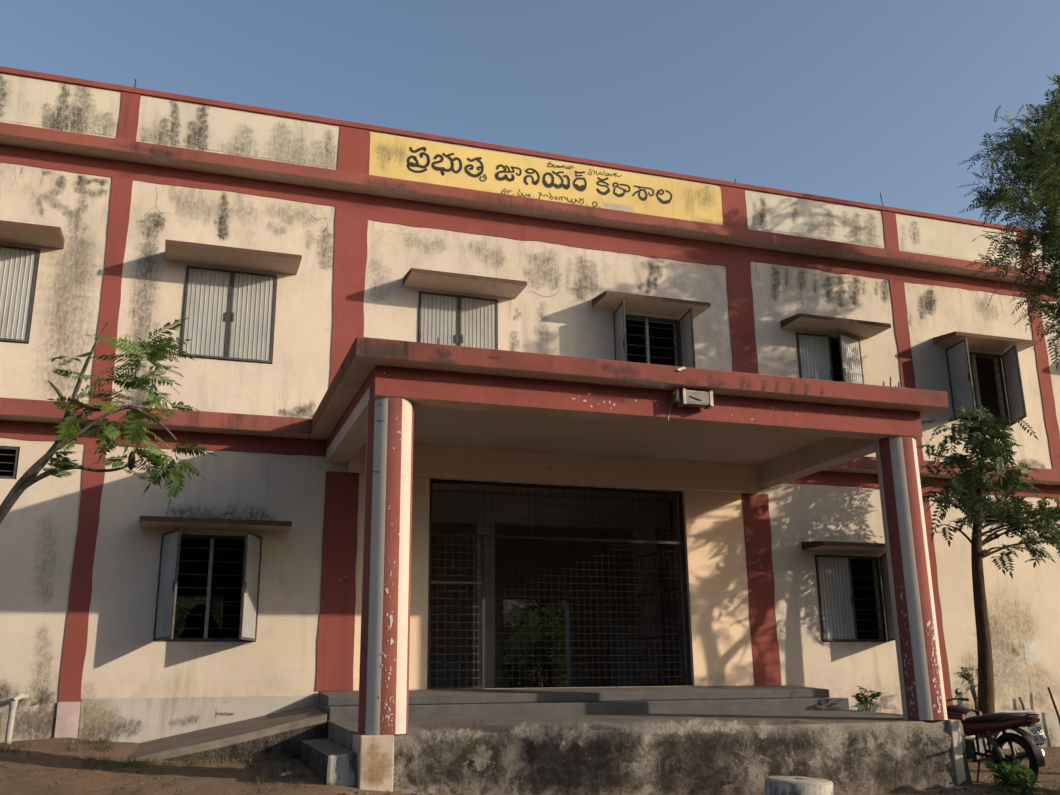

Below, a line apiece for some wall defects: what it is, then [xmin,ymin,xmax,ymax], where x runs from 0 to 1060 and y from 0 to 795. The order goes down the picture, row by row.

damp [44,85,88,131]
damp [151,103,208,160]
damp [37,177,105,230]
damp [218,195,228,239]
damp [117,214,158,407]
damp [574,258,588,299]
damp [828,277,859,305]
peeling [378,558,397,732]
peeling [926,620,941,713]
damp [423,719,746,795]